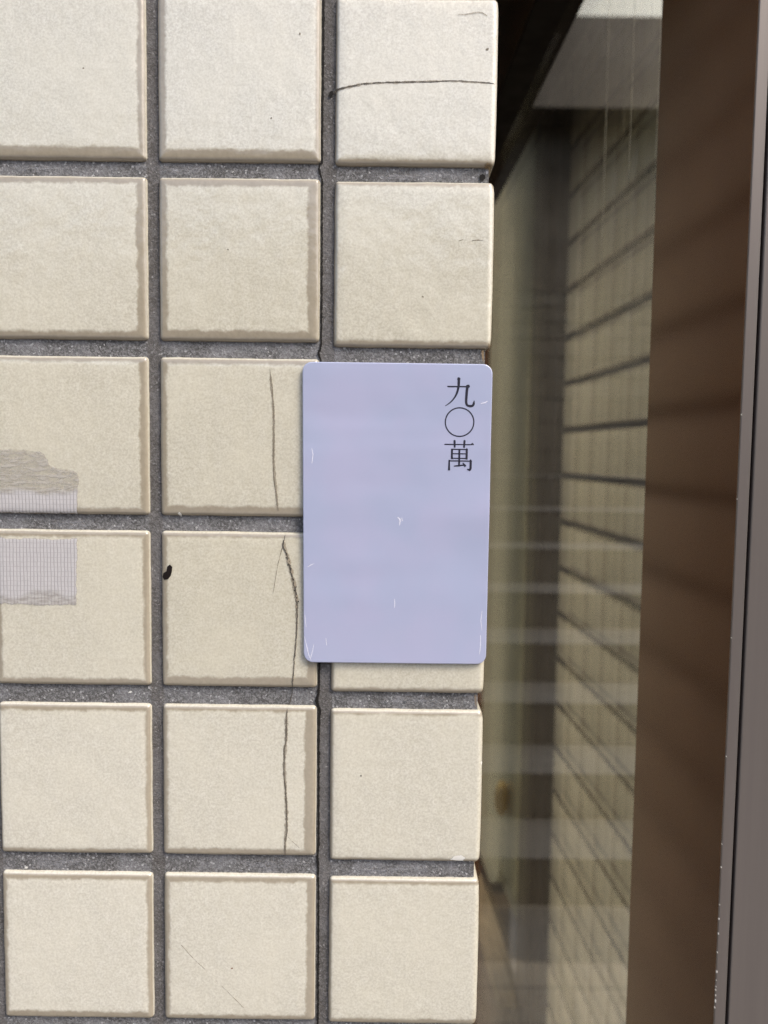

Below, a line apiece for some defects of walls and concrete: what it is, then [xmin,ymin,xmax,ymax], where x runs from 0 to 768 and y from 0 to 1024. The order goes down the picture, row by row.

crack [329,80,494,97]
crack [270,373,278,508]
crack [273,536,299,854]